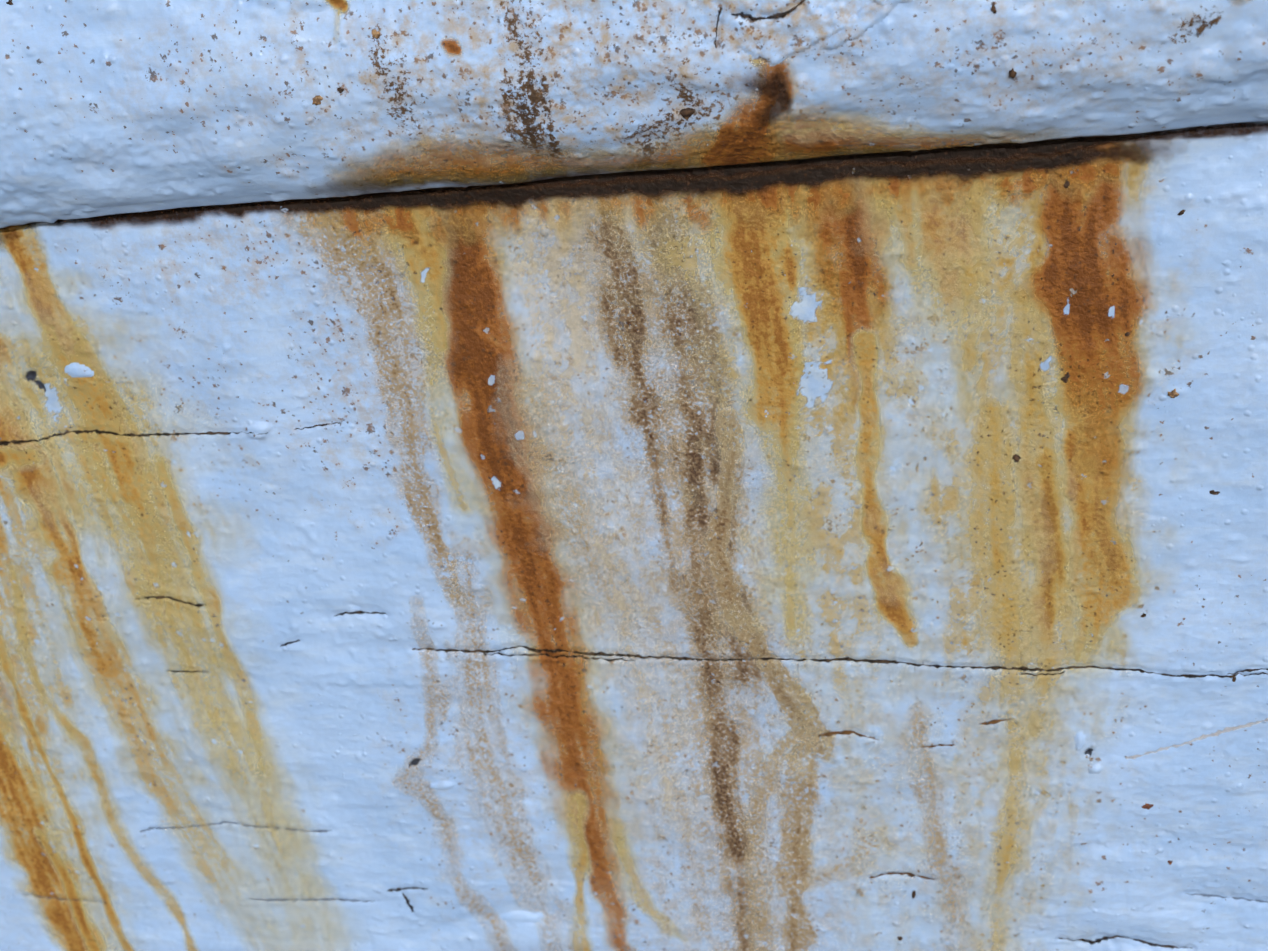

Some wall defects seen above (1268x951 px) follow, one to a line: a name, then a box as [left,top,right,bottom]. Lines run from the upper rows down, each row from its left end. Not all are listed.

corrosion [1169,6,1223,44]
crack [0,422,342,446]
corrosion [68,62,1268,740]
corrosion [0,222,291,951]
corrosion [424,203,670,951]
crack [412,646,1268,678]
crack [818,730,879,740]
crack [869,872,935,880]
corrosion [911,706,964,918]
corrosion [992,784,1028,893]